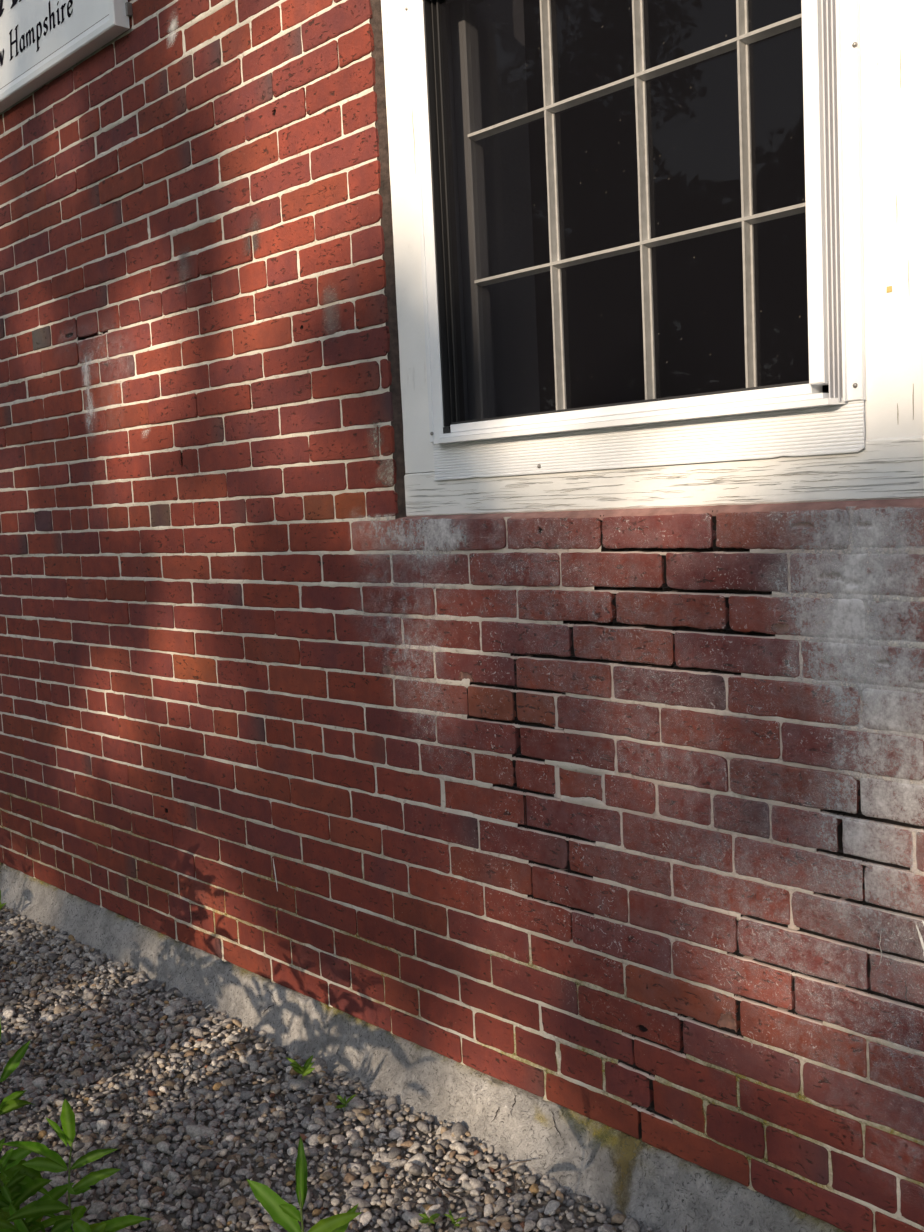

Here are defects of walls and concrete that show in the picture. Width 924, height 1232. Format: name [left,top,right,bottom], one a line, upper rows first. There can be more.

leakage [389,518,462,555]
leakage [787,506,924,916]
crack [618,780,924,1140]
leakage [613,1132,645,1214]